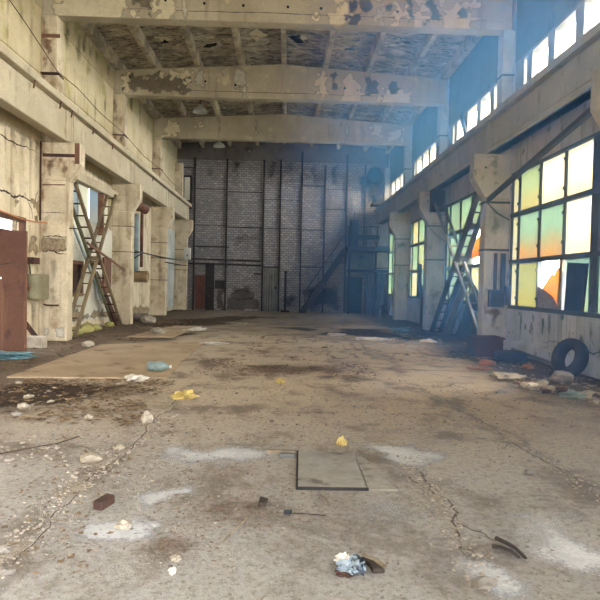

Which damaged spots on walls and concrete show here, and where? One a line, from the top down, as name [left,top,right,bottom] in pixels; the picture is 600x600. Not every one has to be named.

peeling [311,0,373,25]
peeling [385,0,484,29]
peeling [117,66,195,95]
peeling [315,70,412,103]
crack [0,190,67,219]
crack [420,387,600,489]
crack [12,381,200,565]
crack [386,464,496,577]